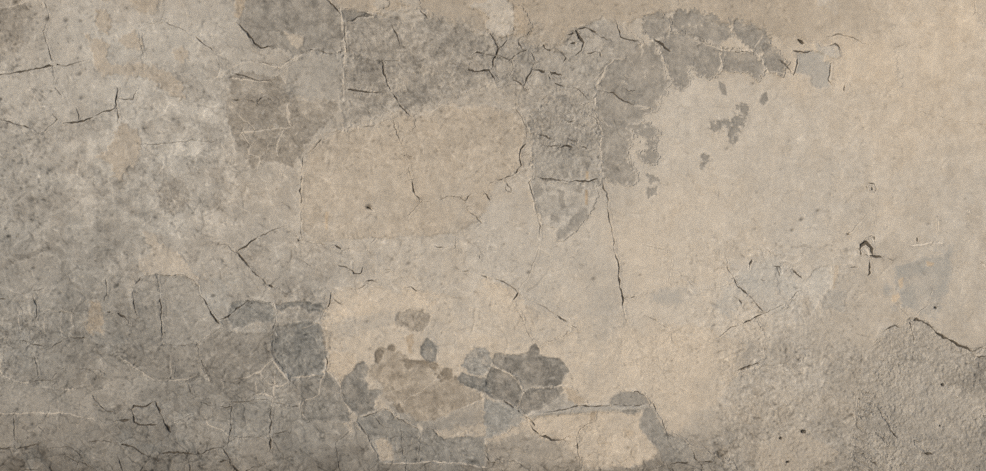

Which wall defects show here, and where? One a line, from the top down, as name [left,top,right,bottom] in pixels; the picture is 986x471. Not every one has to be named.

peeling [223,0,790,241]
crack [690,24,872,94]
peeling [127,230,218,351]
crack [0,0,674,471]
peeling [229,278,741,471]
crack [462,363,738,471]
crack [692,247,806,376]
spalling [755,319,986,471]
crack [870,315,986,361]